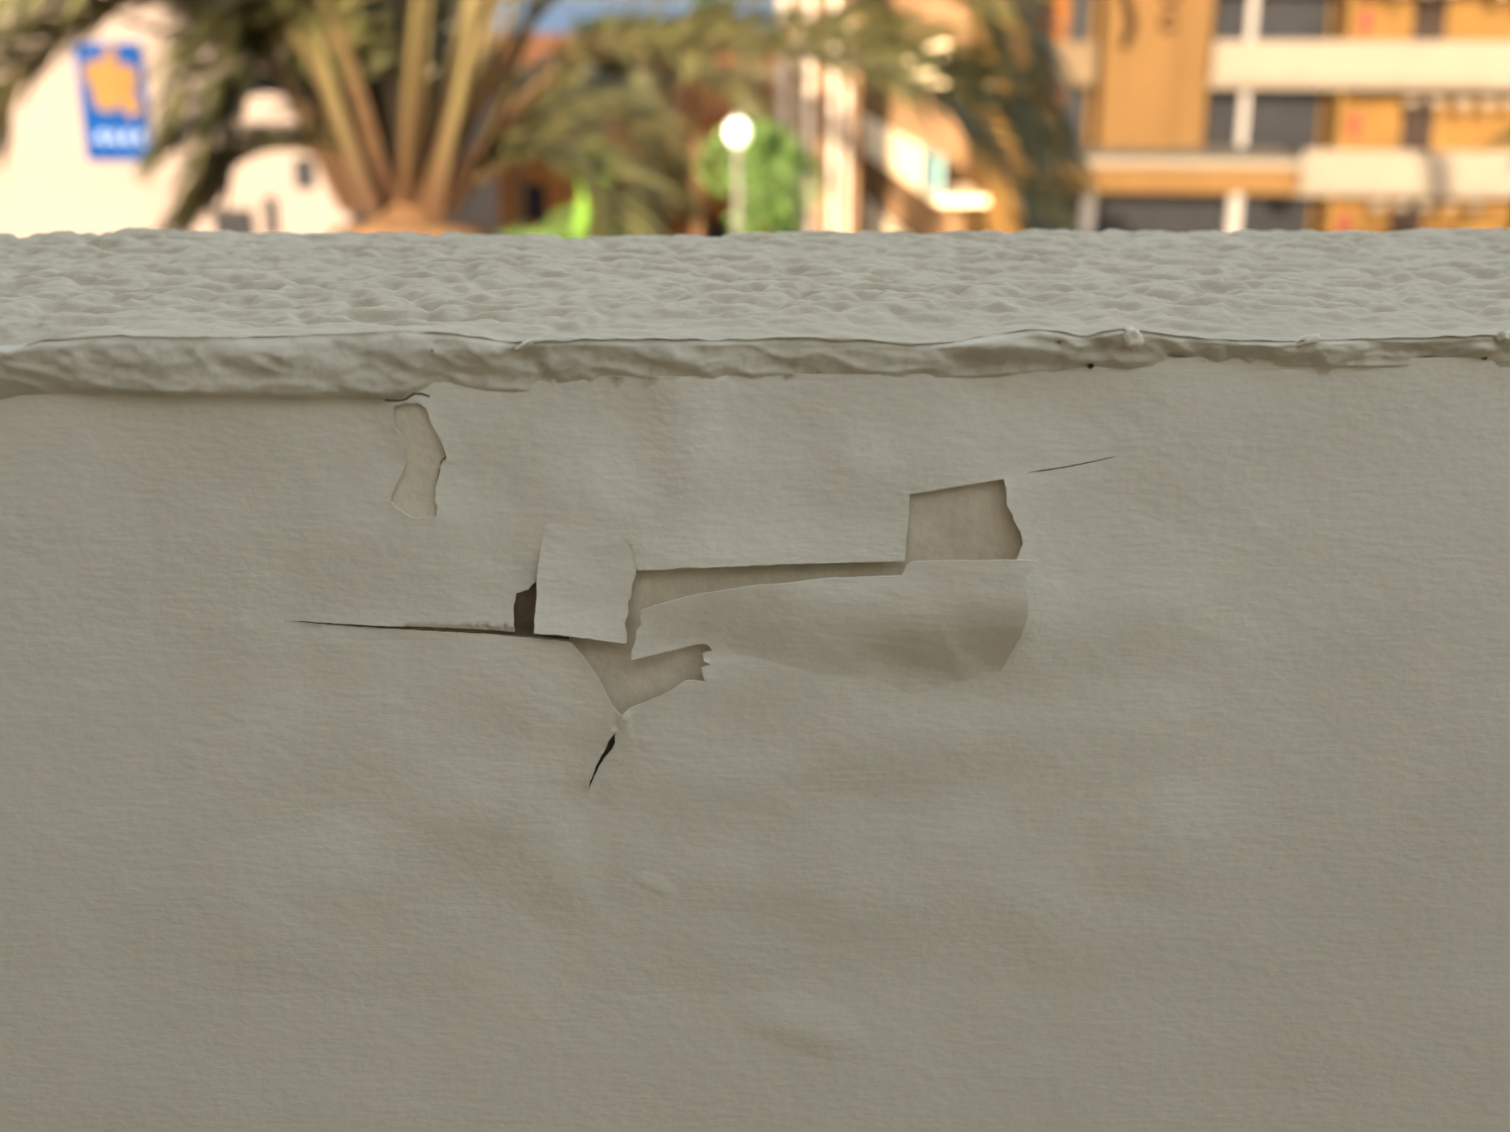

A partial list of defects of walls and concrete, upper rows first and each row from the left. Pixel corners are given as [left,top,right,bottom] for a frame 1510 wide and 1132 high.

spalling [391,403,447,517]
peeling [497,479,1037,715]